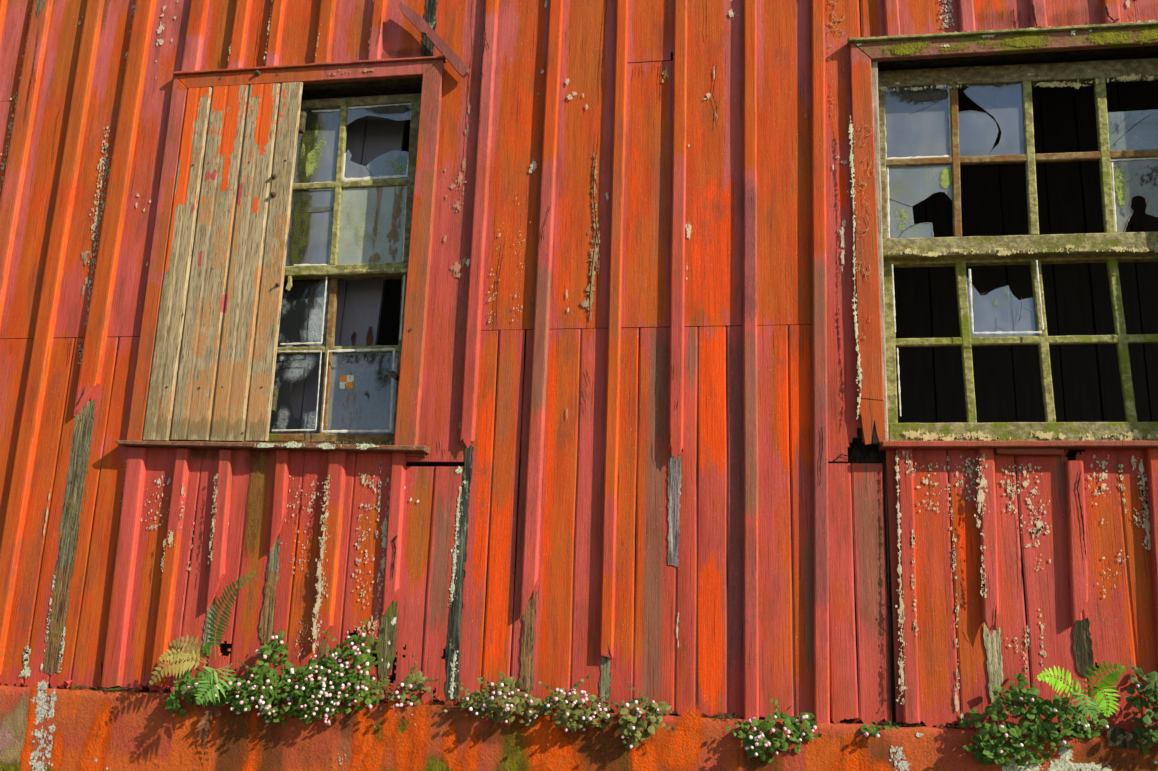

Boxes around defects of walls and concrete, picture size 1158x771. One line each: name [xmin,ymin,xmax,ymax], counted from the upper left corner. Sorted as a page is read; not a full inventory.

peeling [81,127,110,325]
crack [589,129,600,309]
peeling [832,116,863,418]
peeling [141,475,196,572]
peeling [208,474,229,564]
peeling [281,475,330,660]
peeling [347,462,390,639]
peeling [894,429,1051,719]
peeling [1031,429,1158,441]
peeling [1087,455,1151,550]